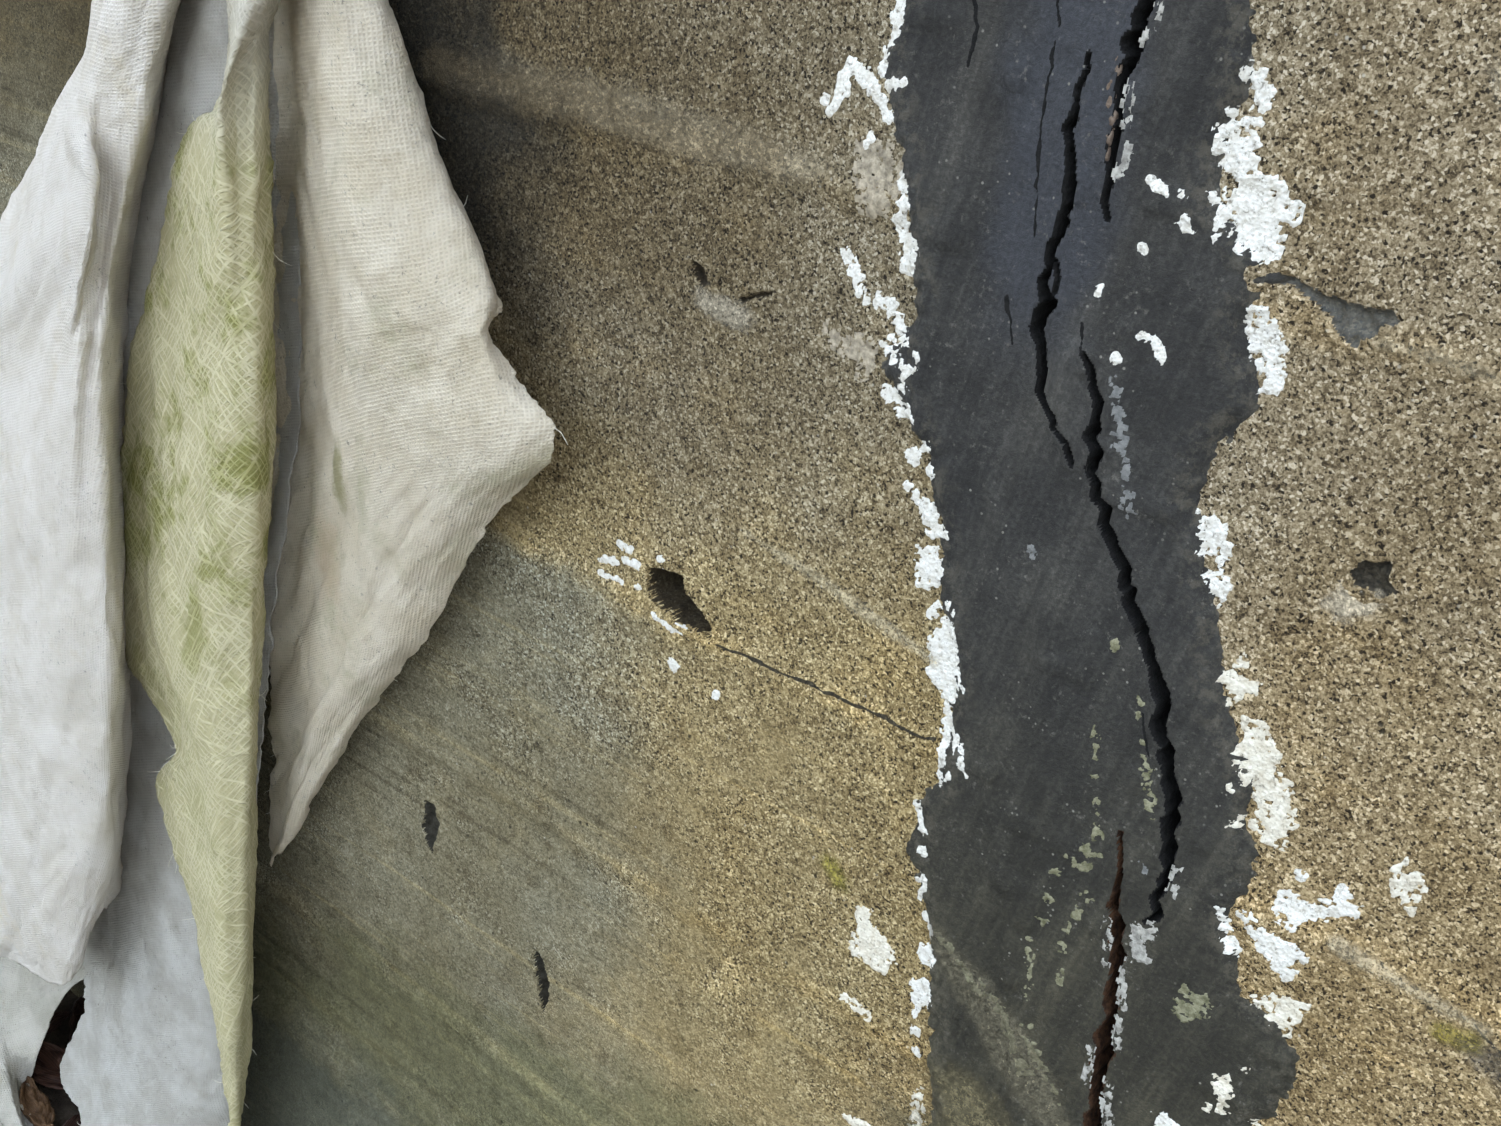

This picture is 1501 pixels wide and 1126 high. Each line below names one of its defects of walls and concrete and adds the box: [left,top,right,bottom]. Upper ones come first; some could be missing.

crack [966,0,980,68]
leakage [1138,1,1164,48]
leakage [1111,78,1136,183]
peeling [1205,59,1415,396]
spalling [597,539,718,649]
crack [1004,0,1189,1126]
spalling [1325,551,1414,617]
crack [715,644,937,741]
spalling [418,793,445,861]
leakage [1164,864,1184,900]
spalling [527,942,555,1021]
leakage [1081,915,1158,1126]